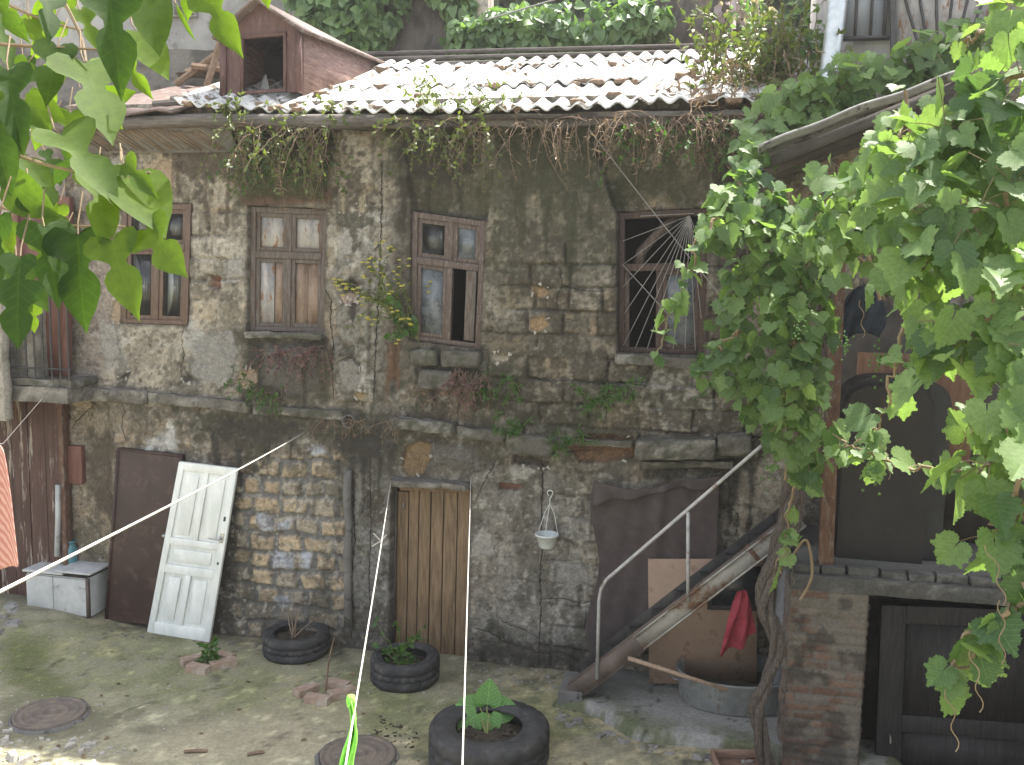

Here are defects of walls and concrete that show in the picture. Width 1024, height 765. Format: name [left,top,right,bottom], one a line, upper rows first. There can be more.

crack [325,162,383,401]
damp [335,422,382,513]
spalling [400,441,433,477]
crack [474,458,590,667]